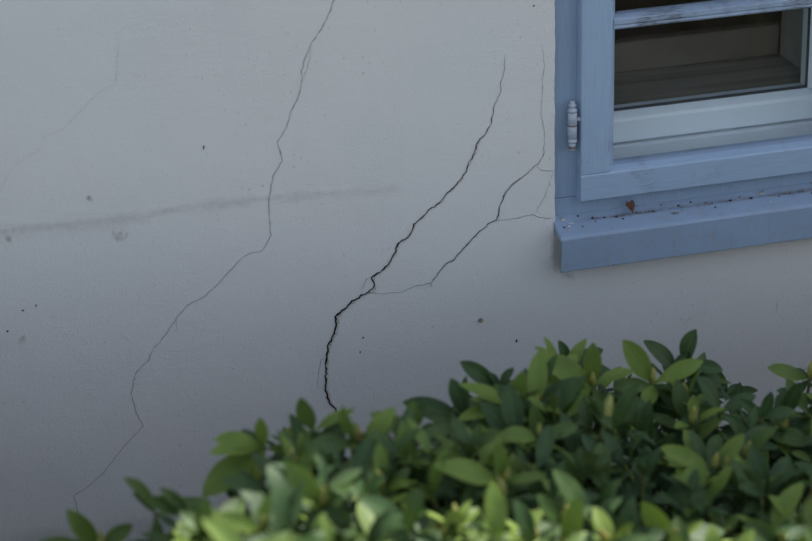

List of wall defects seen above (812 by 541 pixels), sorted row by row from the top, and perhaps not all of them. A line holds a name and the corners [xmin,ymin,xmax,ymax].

crack [74,0,334,508]
crack [317,47,554,411]